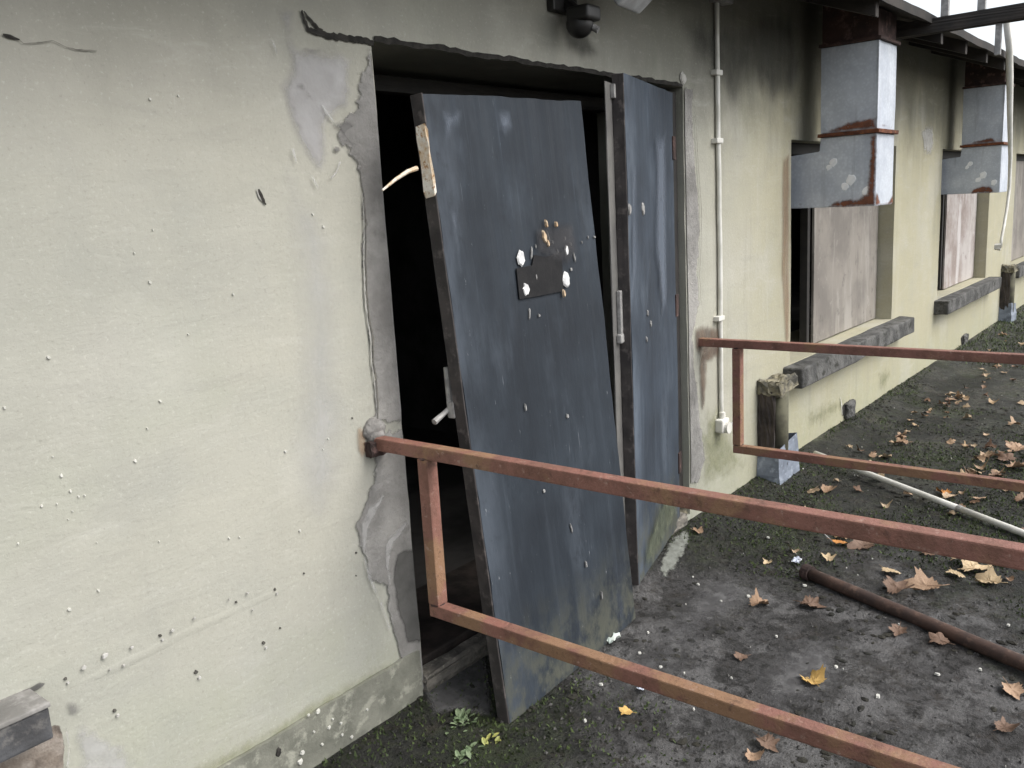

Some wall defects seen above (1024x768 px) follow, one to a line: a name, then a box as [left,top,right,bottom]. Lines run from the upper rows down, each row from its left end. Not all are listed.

crack [3,34,94,51]
crack [301,10,374,46]
corrosion [832,119,893,207]
crack [362,193,379,419]
flaking render [359,417,387,459]
flaking render [355,499,381,554]